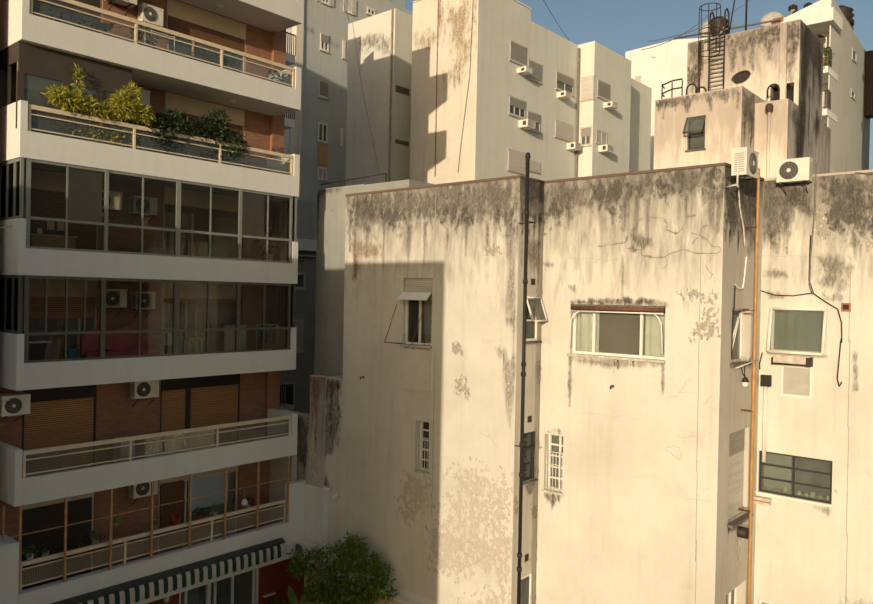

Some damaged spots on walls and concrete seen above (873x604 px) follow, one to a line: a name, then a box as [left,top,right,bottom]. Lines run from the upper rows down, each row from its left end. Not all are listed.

water stain [731,26,823,158]
water stain [349,167,811,313]
crack [572,215,721,278]
water stain [821,259,848,286]
water stain [821,176,873,247]
peeling [676,288,720,344]
peeling [425,457,519,604]